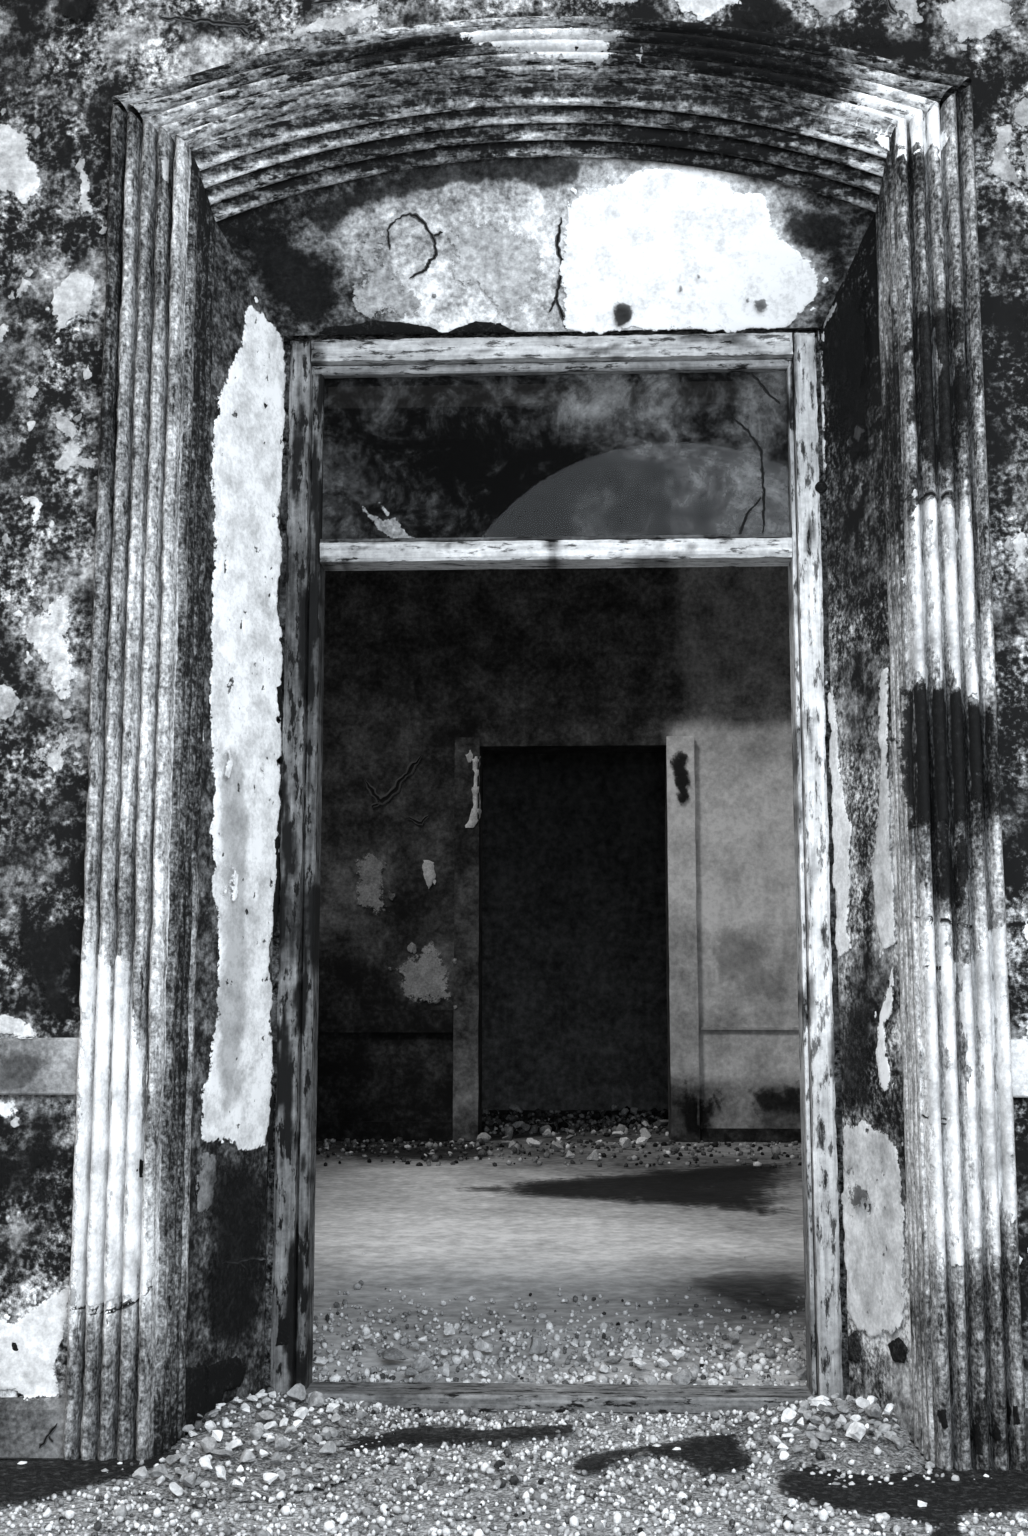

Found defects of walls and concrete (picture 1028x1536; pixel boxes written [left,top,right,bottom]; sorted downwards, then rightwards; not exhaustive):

damp [55,135,76,173]
crack [387,212,443,278]
crack [549,217,568,331]
peeling [319,168,837,471]
damp [825,278,870,460]
peeling [196,297,286,1214]
crack [365,755,429,825]
damp [670,751,690,803]
damp [0,919,77,1019]
peeling [0,910,159,1400]
peeling [838,1120,908,1363]
peeling [917,902,1028,1267]